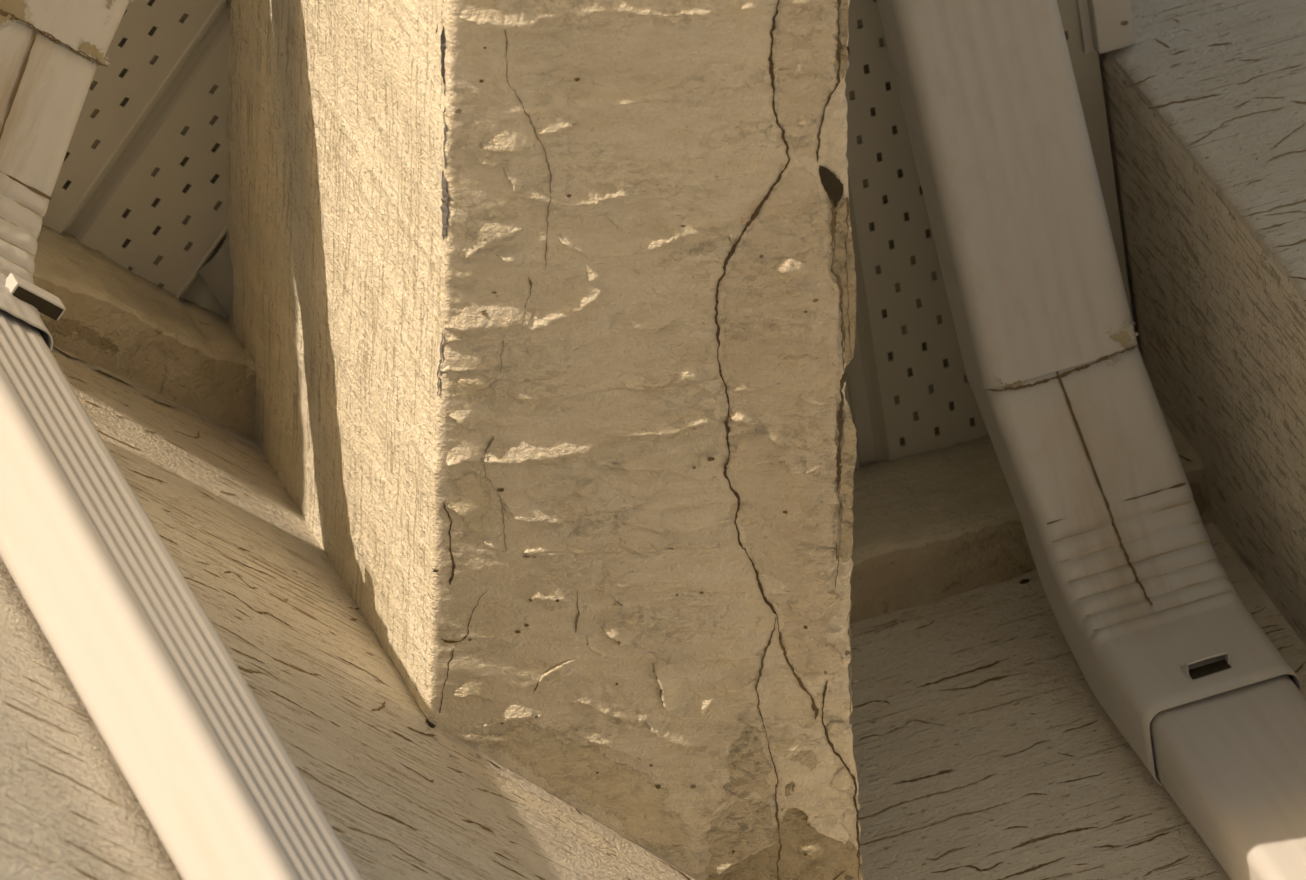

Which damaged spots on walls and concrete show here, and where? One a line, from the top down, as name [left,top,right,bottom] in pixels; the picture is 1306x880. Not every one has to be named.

crack [500,30,552,371]
spalling [819,166,857,365]
crack [443,501,456,584]
crack [483,437,506,548]
crack [715,0,1015,880]
crack [439,591,487,713]
spalling [706,730,863,880]
crack [931,827,1098,880]